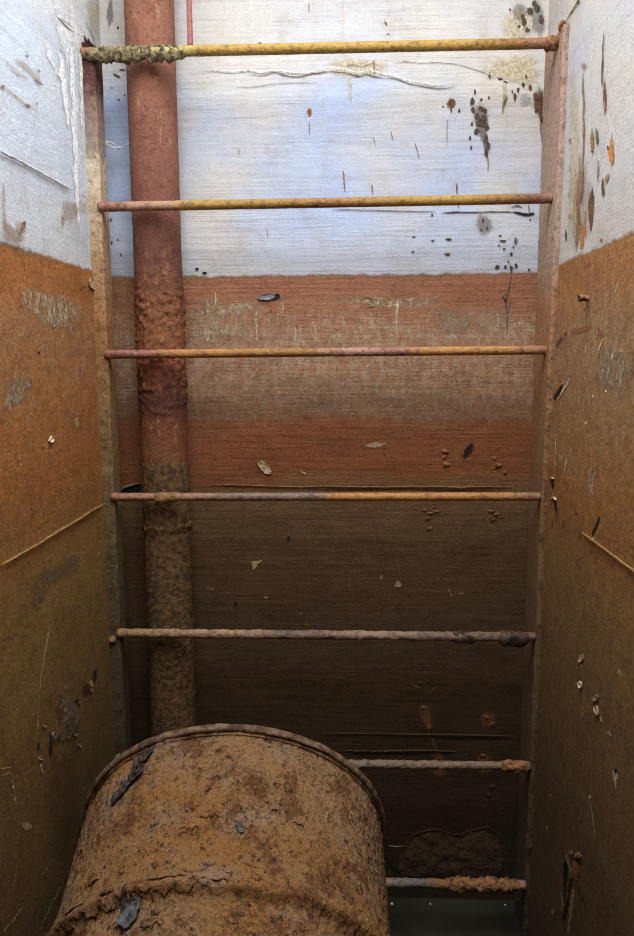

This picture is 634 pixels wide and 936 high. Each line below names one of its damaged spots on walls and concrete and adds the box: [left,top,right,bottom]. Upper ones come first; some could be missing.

rust [575,74,586,251]
water stain [112,276,152,747]
water stain [183,234,537,900]
spalling [37,670,97,773]
spalling [551,851,587,934]